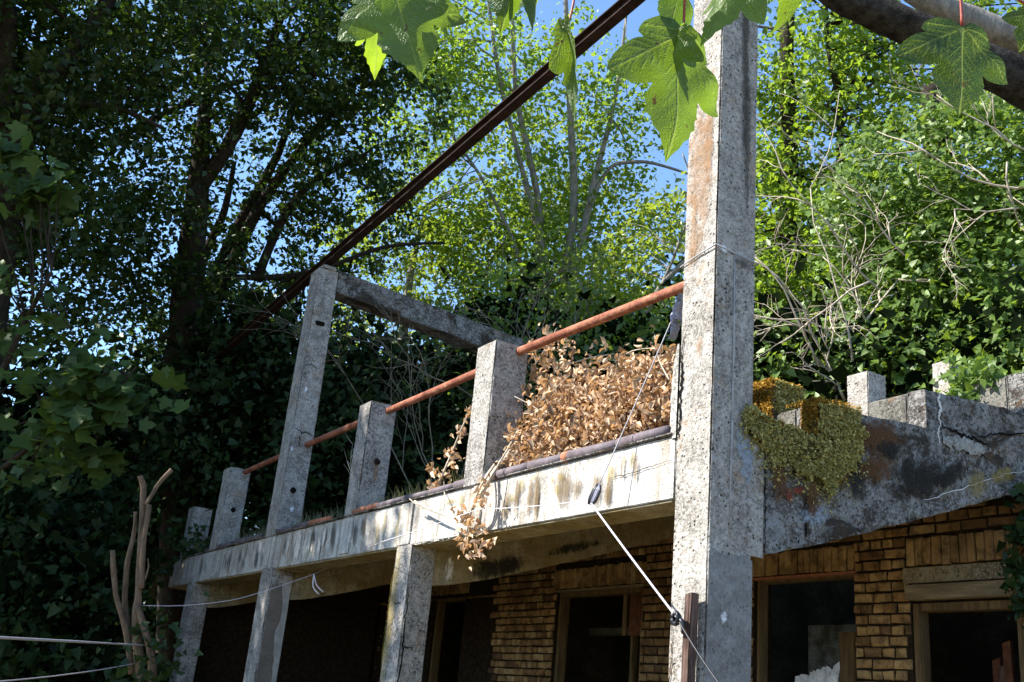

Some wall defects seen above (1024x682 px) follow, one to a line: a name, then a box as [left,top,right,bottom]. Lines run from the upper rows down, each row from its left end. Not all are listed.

leakage [848,459,866,500]
leakage [877,441,966,495]
crack [923,392,1024,500]
leakage [282,523,336,561]